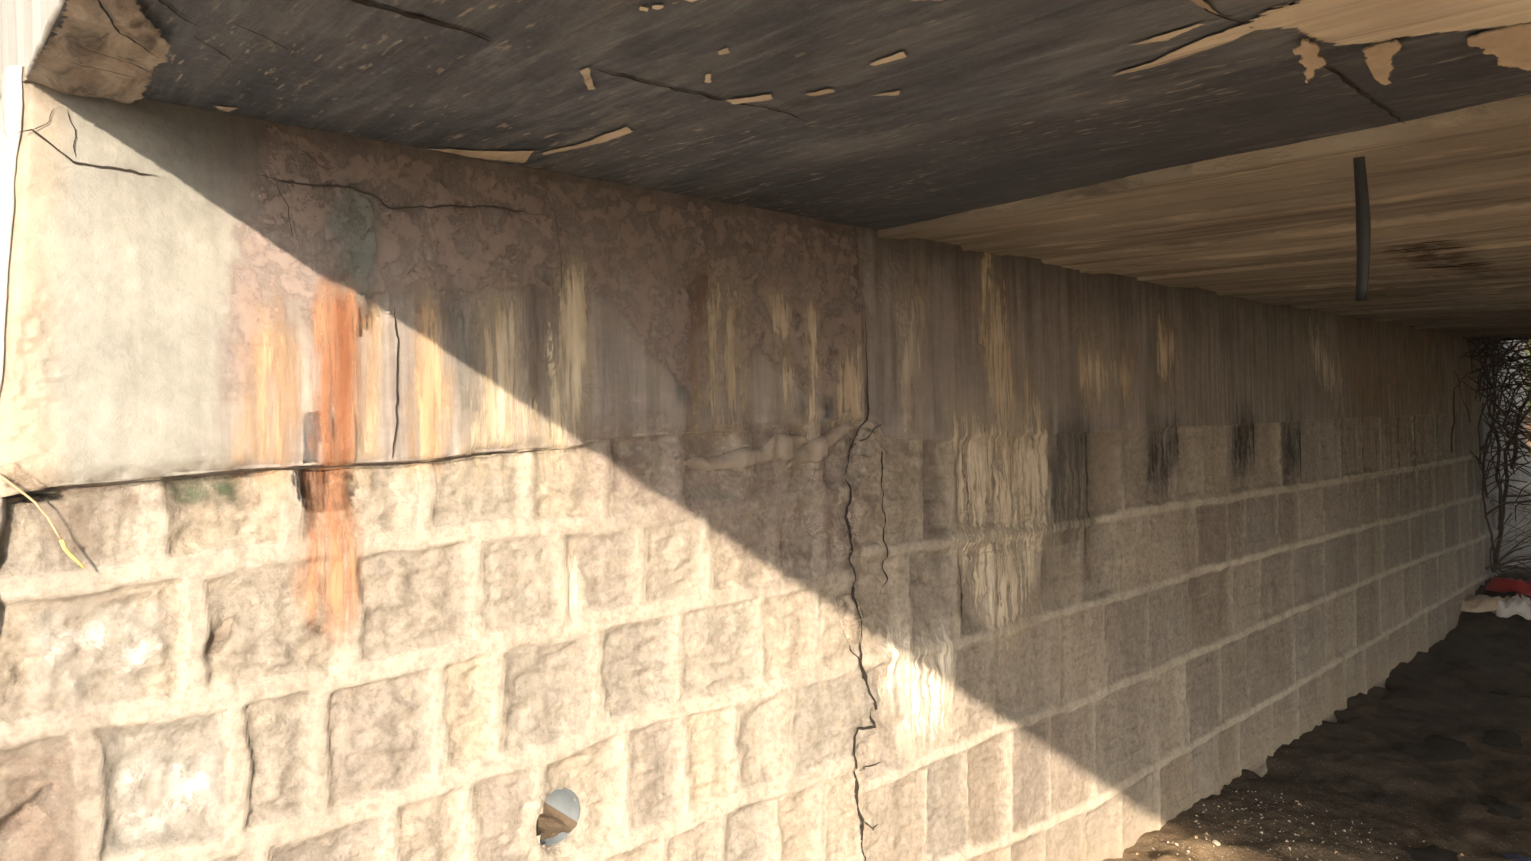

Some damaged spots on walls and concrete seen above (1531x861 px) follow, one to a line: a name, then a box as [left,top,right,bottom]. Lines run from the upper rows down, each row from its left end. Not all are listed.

spalling [23,0,173,104]
crack [351,0,491,42]
peeling [870,52,906,66]
peeling [1112,0,1531,86]
crack [590,68,807,122]
peeling [725,94,773,104]
crack [1323,66,1404,123]
crack [15,108,157,176]
peeling [428,127,633,163]
corrosion [250,330,296,476]
corrosion [305,285,360,629]
crack [844,303,888,861]